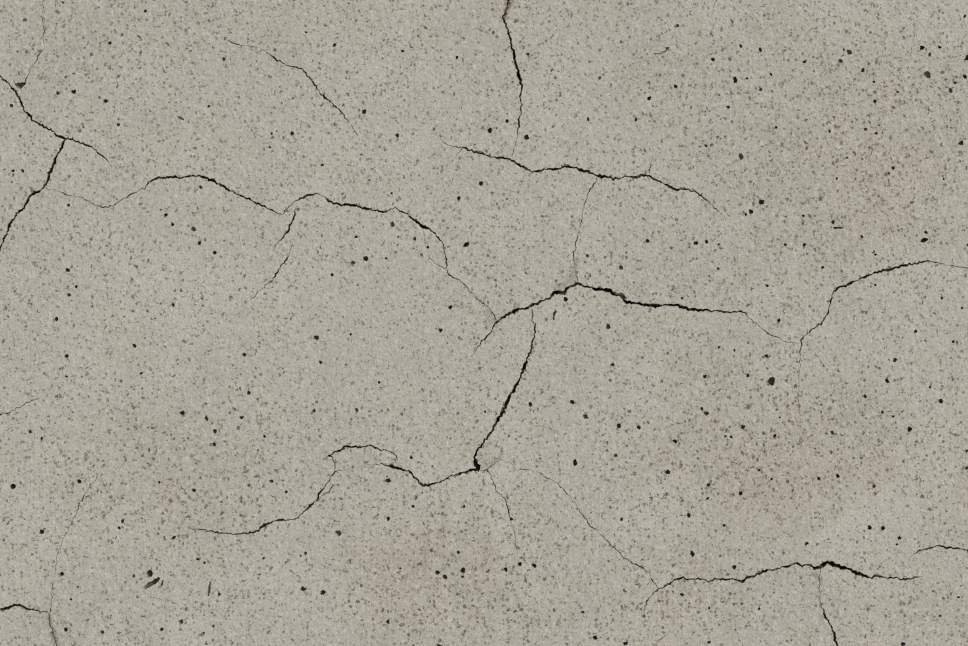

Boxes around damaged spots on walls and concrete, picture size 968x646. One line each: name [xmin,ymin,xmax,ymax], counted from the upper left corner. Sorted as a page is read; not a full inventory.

crack [24,4,45,84]
crack [0,75,110,251]
crack [226,39,358,135]
crack [440,0,719,212]
crack [59,175,968,646]
crack [0,465,106,646]